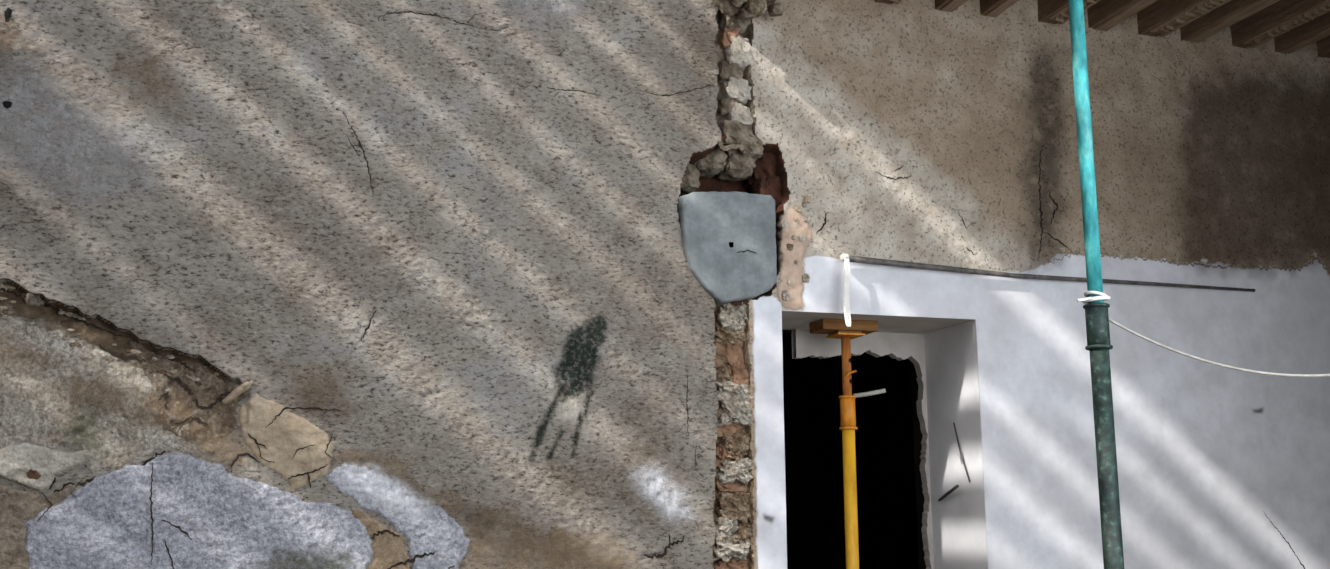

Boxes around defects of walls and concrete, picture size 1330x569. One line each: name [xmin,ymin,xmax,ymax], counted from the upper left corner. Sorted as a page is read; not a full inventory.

crack [378,11,506,31]
peeling [0,278,341,569]
water stain [529,383,593,461]